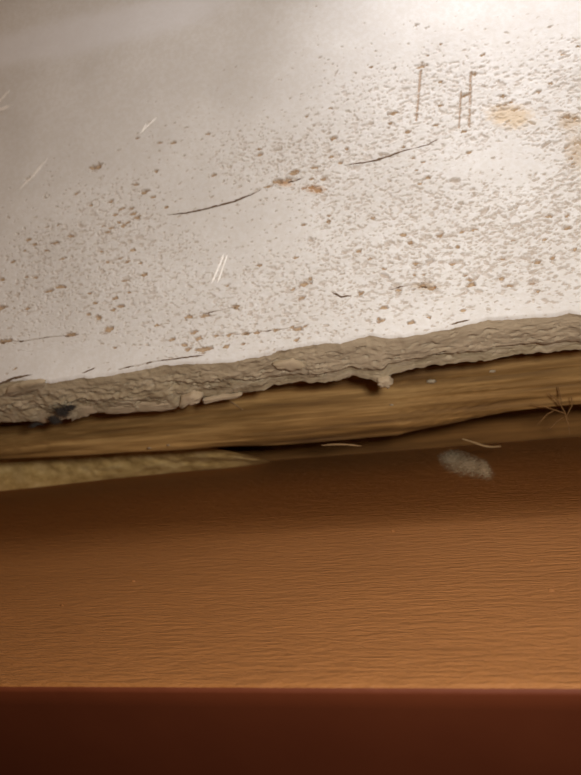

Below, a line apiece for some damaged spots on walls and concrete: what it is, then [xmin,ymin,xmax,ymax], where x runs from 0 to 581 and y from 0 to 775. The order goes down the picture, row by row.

crack [349,139,438,165]
crack [172,190,260,215]